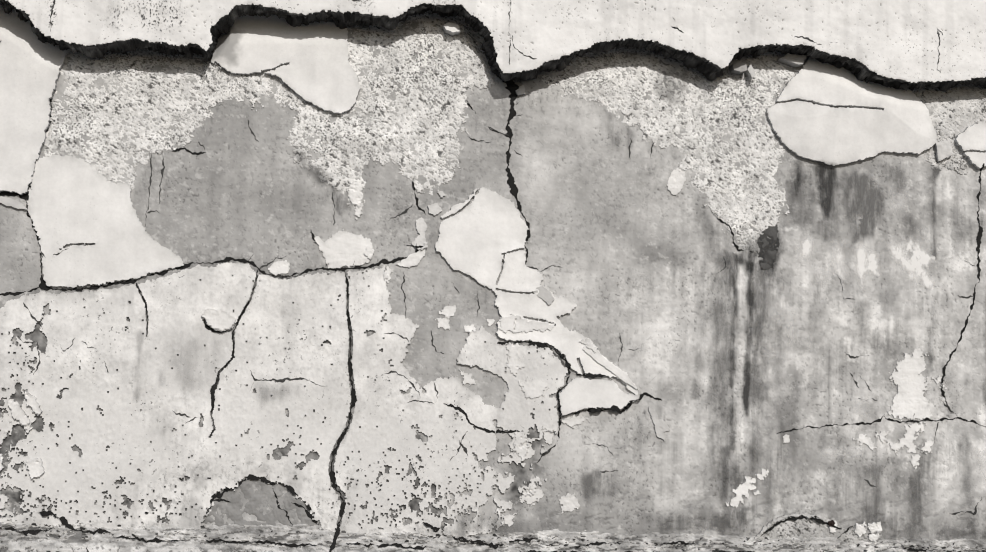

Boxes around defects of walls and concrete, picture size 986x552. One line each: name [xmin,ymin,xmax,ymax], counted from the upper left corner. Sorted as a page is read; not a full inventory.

crack [0,178,633,552]
spalling [0,5,639,445]
crack [467,2,562,271]
crack [497,336,662,463]
spalling [537,46,807,270]
water stain [714,339,757,412]
water stain [733,238,779,335]
water stain [818,164,836,217]
crack [777,163,986,453]
peeling [853,348,947,469]
water stain [889,232,937,288]
spalling [911,83,986,174]